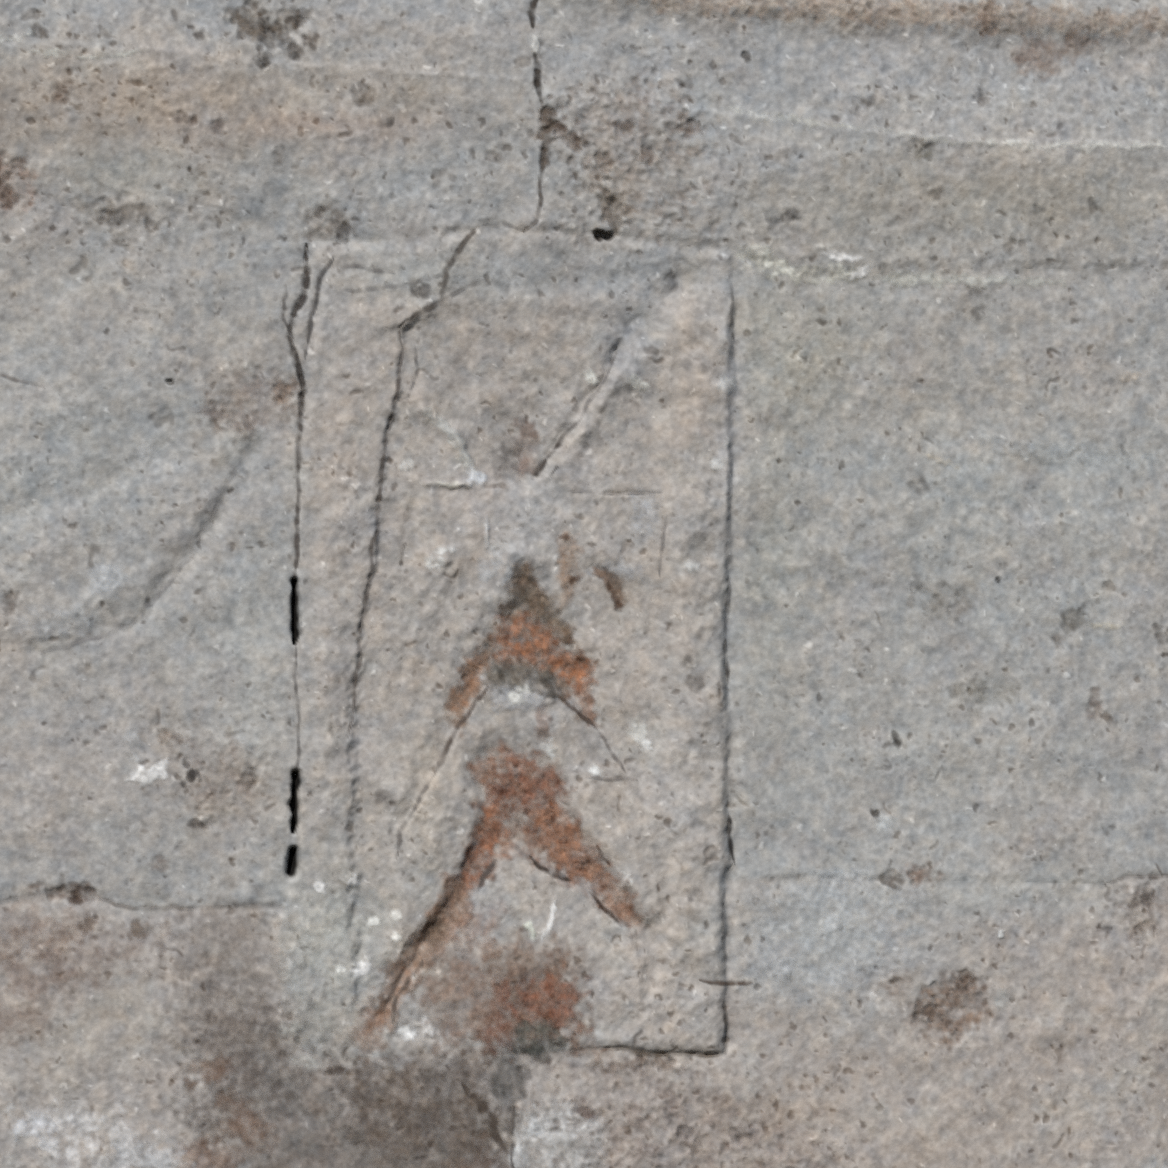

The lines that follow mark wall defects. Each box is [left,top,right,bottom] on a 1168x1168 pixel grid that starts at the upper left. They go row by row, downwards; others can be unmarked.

crack [523,0,565,232]
crack [378,231,475,500]
crack [283,245,393,657]
corrosion [451,565,592,726]
corrosion [594,567,623,606]
crack [443,690,485,754]
crack [287,741,300,876]
crack [397,785,427,854]
corrosion [370,745,631,1025]
corrosion [430,946,578,1054]
leakage [252,1074,494,1168]